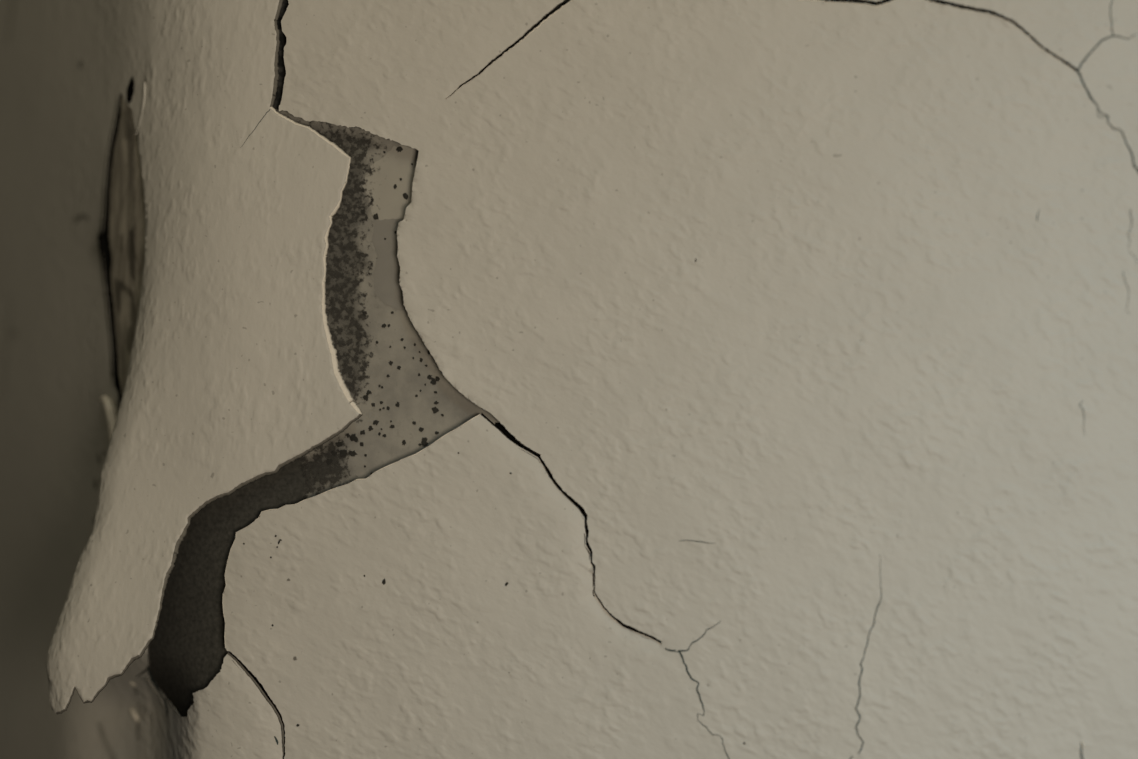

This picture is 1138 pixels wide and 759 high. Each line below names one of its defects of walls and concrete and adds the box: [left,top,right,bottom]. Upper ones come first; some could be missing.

crack [272,0,289,109]
crack [446,0,573,99]
crack [810,0,896,8]
crack [925,0,1138,172]
peeling [46,0,499,717]
crack [482,408,729,759]
crack [227,652,285,758]